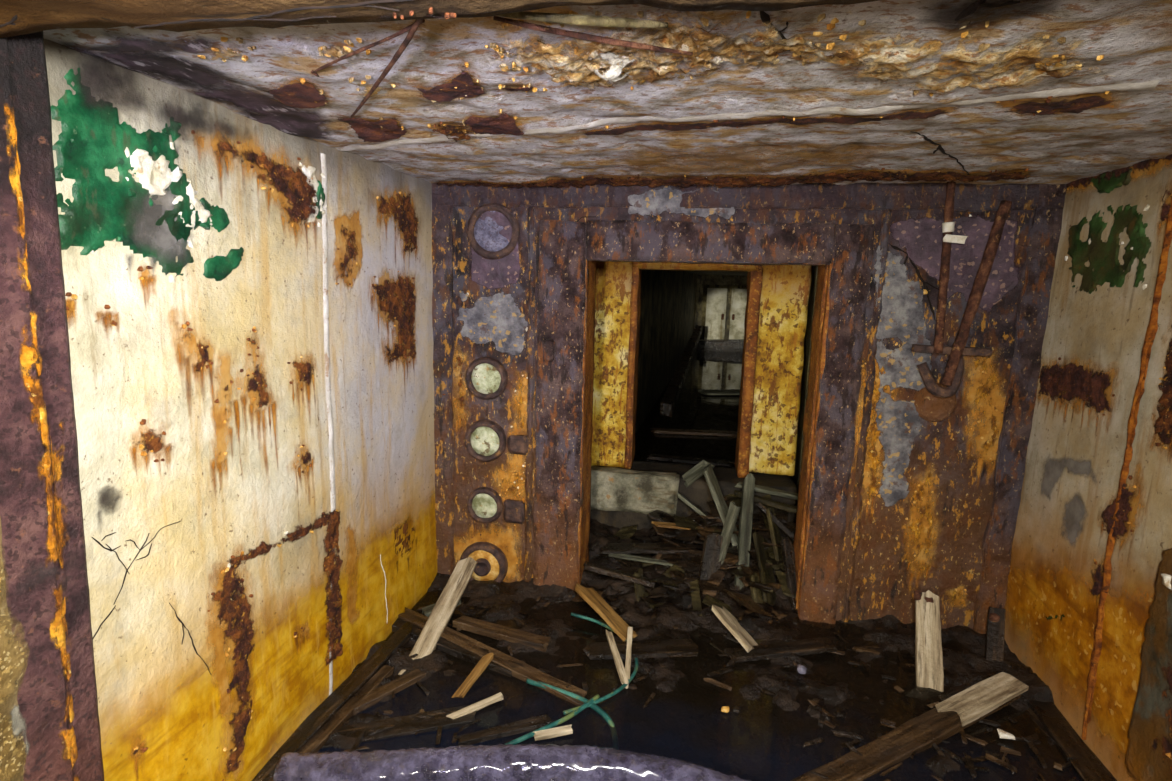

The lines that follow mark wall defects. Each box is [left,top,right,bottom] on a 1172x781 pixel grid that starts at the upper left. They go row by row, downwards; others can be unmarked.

spalling [311,7,456,118]
spalling [485,10,1104,97]
peeling [51,68,244,283]
corrosion [191,130,317,237]
corrosion [333,211,363,288]
corrosion [371,190,419,384]
peeling [1064,168,1152,294]
corrosion [132,419,171,466]
corrosion [177,321,278,487]
corrosion [1082,190,1172,740]
water stain [101,495,437,781]
corrosion [207,509,359,781]